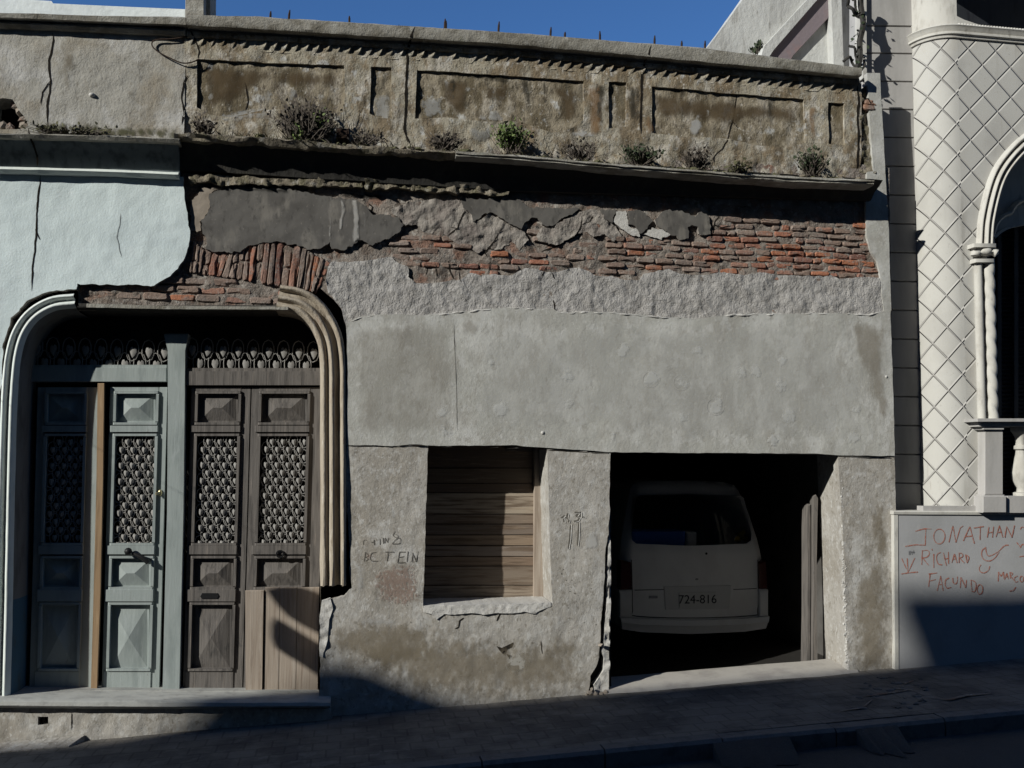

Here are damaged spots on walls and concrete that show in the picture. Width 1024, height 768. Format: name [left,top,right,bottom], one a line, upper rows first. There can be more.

spalling [0,101,28,129]
water stain [445,74,505,111]
water stain [630,89,638,117]
crack [713,95,738,158]
crack [28,33,54,290]
peeling [94,186,879,305]
water stain [338,620,572,695]